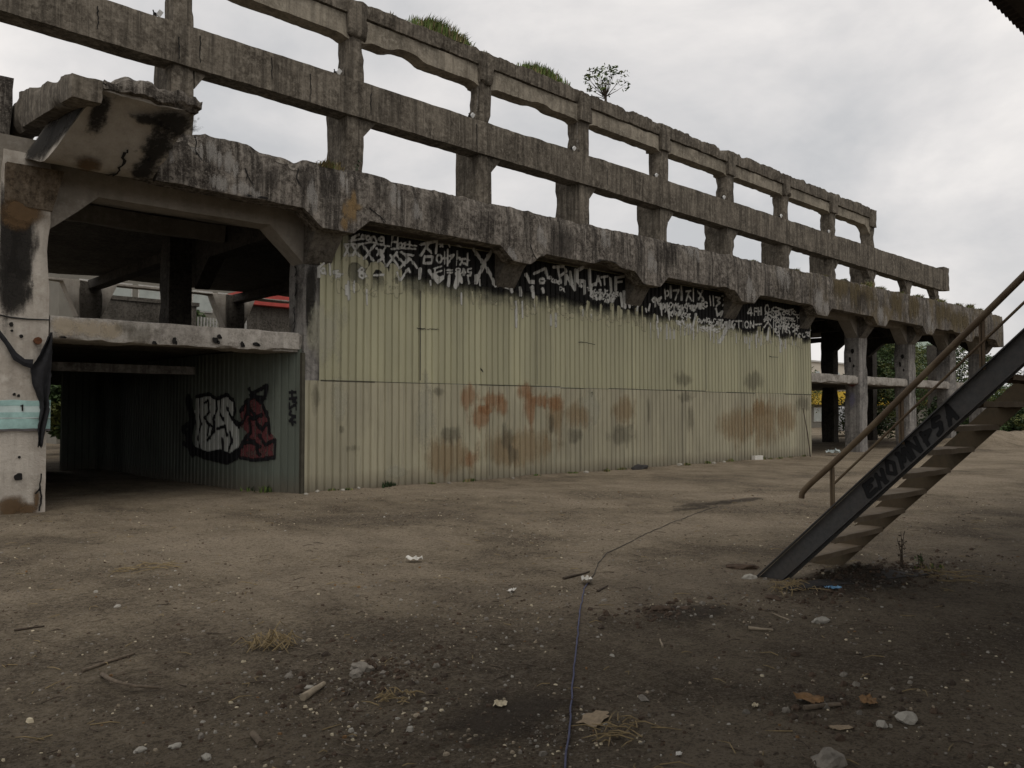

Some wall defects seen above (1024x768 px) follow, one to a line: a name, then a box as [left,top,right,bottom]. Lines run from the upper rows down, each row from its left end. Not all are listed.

damp [26,97,111,160]
crack [105,150,128,176]
damp [130,111,196,182]
damp [0,184,42,314]